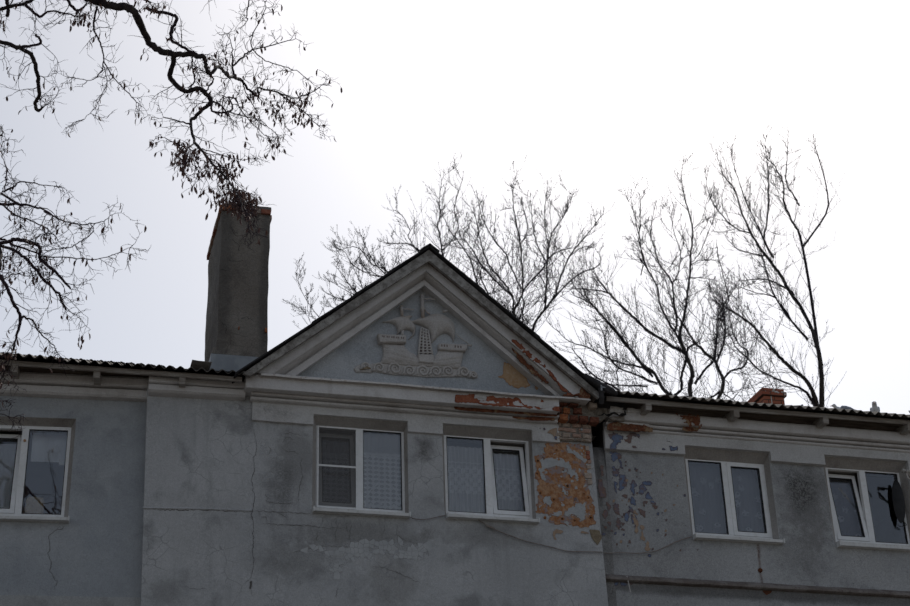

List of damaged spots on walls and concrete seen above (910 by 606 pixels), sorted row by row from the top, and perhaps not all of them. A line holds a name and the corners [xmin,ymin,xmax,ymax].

crack [162,426,432,595]
peeling [455,362,676,557]